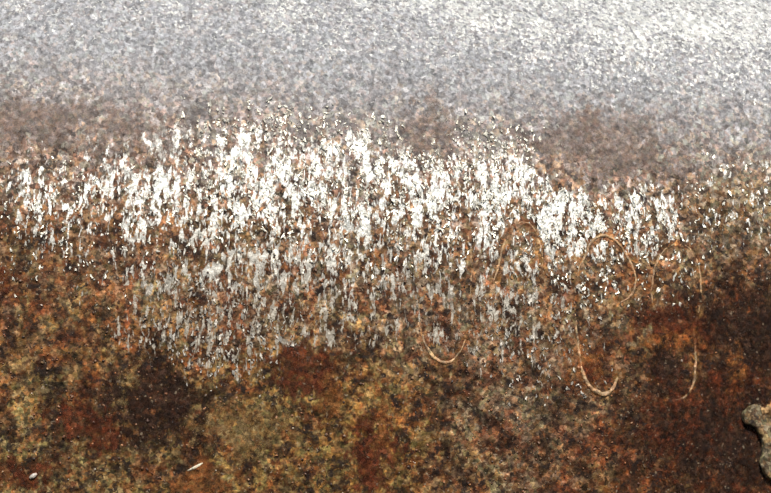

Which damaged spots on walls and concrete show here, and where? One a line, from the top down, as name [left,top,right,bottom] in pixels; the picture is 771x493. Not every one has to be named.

corrosion [0,456,56,492]
corrosion [56,342,210,457]
corrosion [172,453,233,493]
corrosion [257,320,343,417]
corrosion [342,382,412,493]
corrosion [563,337,603,384]
corrosion [626,261,771,493]
spalling [741,402,771,480]